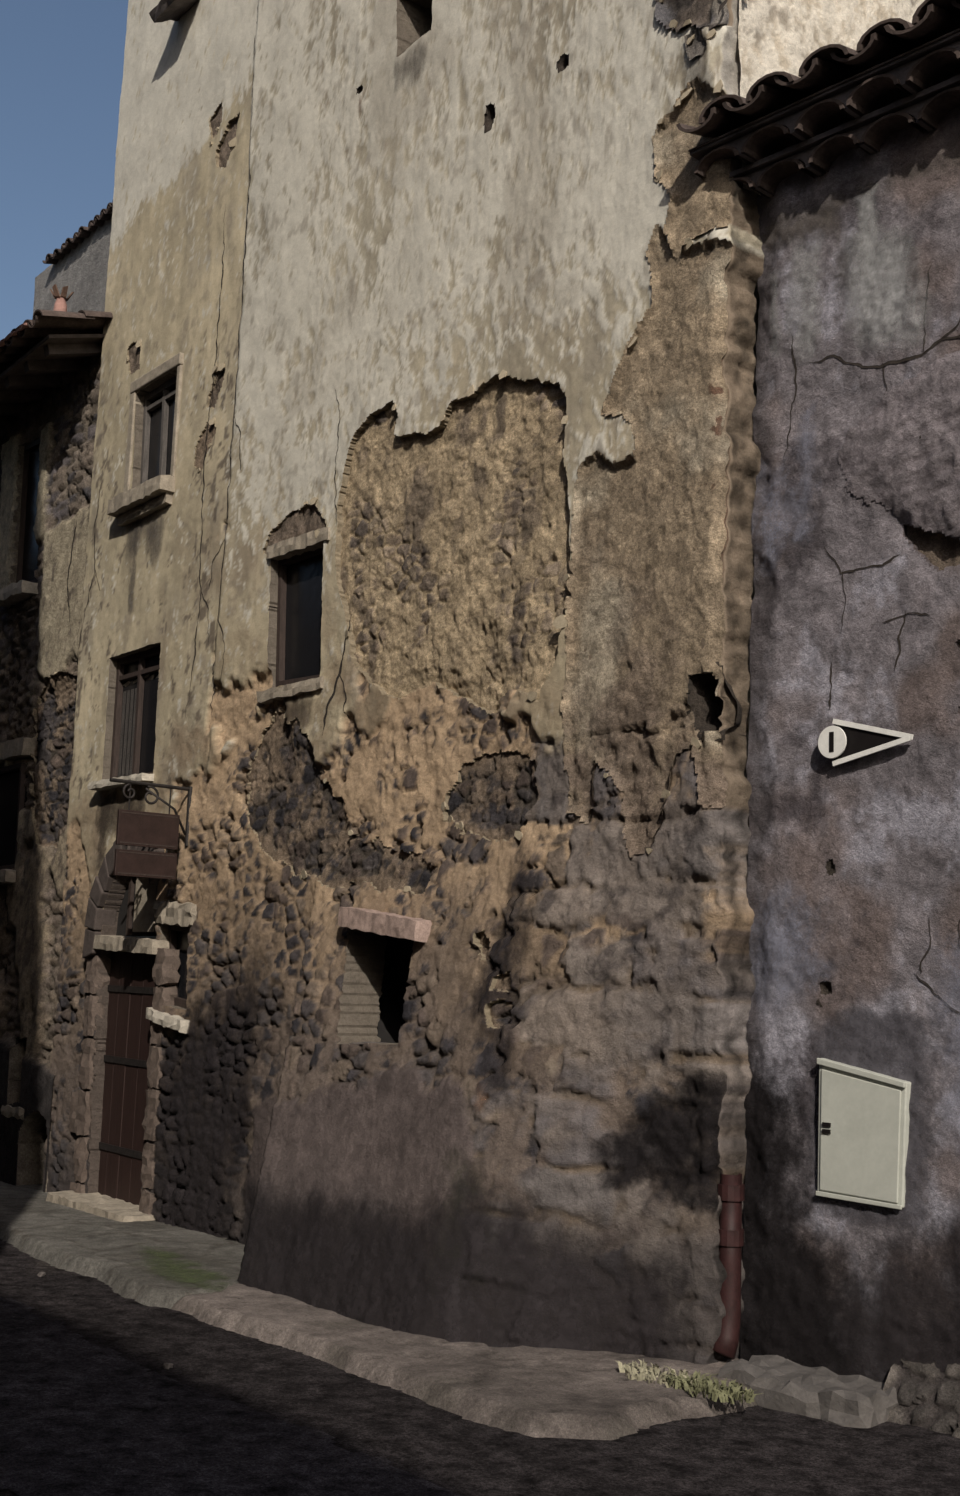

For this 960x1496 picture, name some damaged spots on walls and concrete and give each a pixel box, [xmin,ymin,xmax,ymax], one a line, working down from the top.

flaking render [209,105,240,168]
crack [783,264,960,459]
flaking render [195,363,225,472]
flaking render [265,0,749,857]
flaking render [907,526,960,570]
flaking render [33,672,78,847]
flaking render [246,711,438,894]
spalling [479,932,491,960]
spalling [490,1001,514,1028]
crack [916,920,960,1014]
leakage [154,980,684,1359]